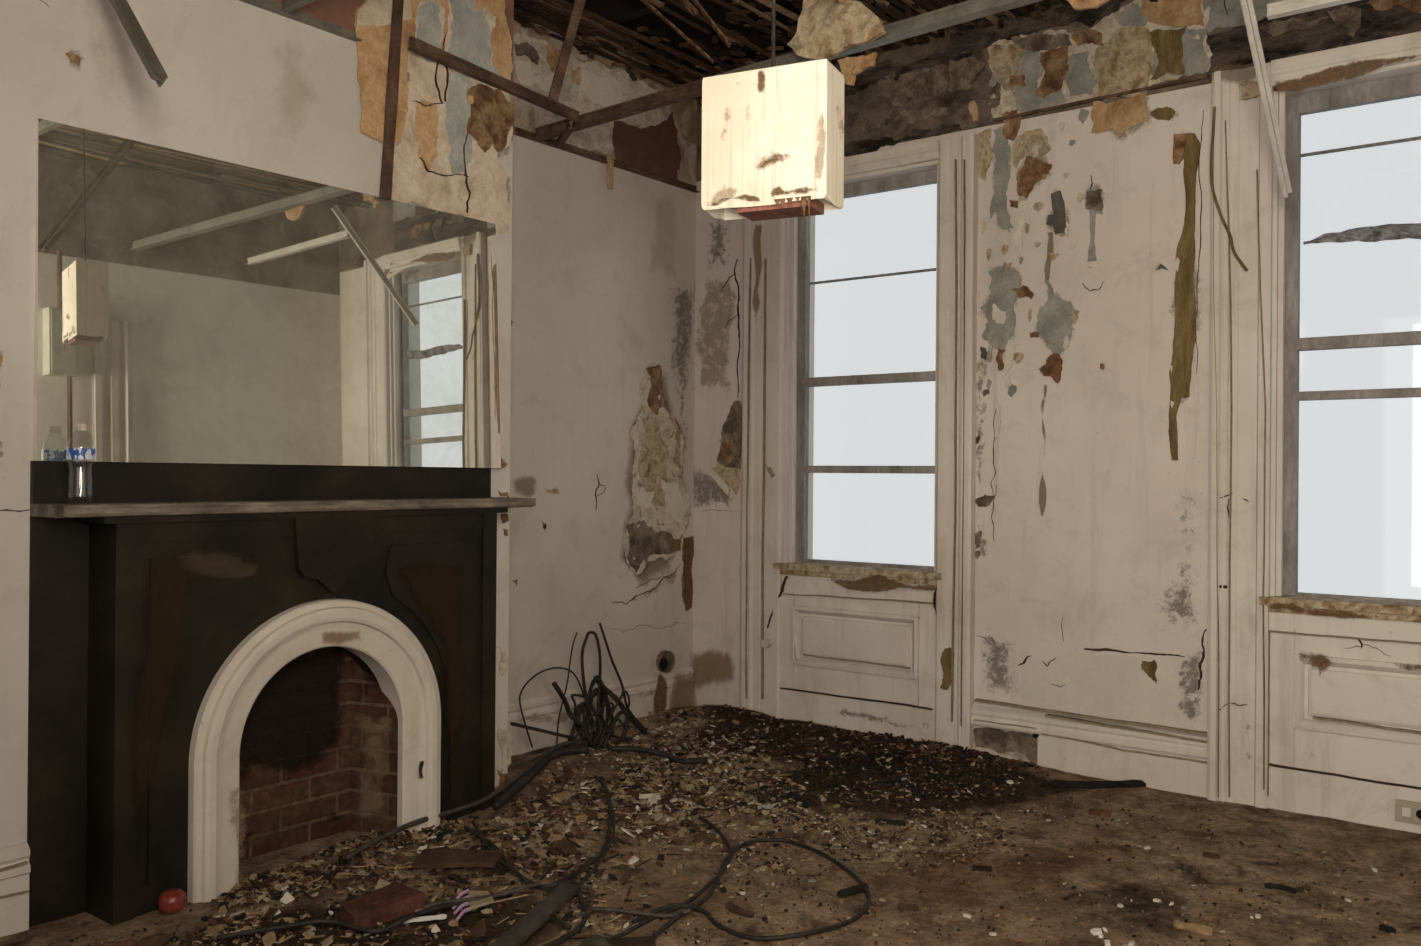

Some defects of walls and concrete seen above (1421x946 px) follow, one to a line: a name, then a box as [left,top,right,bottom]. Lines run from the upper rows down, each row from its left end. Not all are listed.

flaking render [354,0,681,234]
flaking render [949,0,1283,560]
flaking render [622,364,691,580]
flaking render [702,401,742,495]